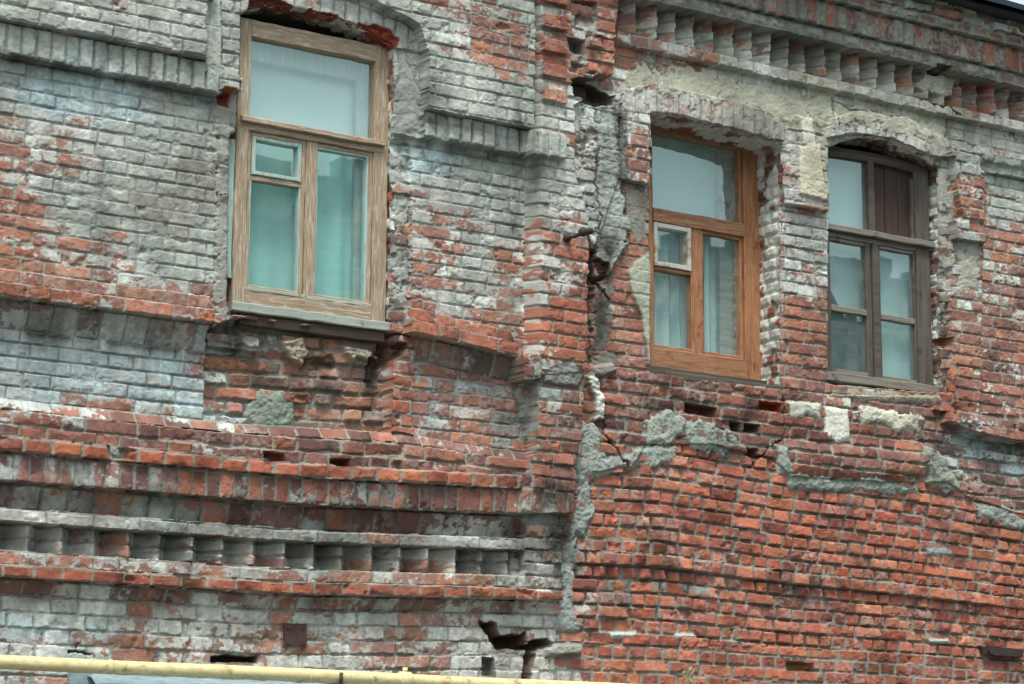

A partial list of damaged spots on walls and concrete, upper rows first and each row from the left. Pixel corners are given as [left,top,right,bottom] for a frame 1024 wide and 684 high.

spalling [247,0,340,23]
spalling [356,21,401,50]
spalling [566,35,584,55]
spalling [912,62,966,99]
spalling [216,85,239,110]
crack [586,145,611,373]
crack [748,394,787,470]
spalling [262,450,293,463]
spalling [329,457,358,468]
spalling [210,653,259,664]